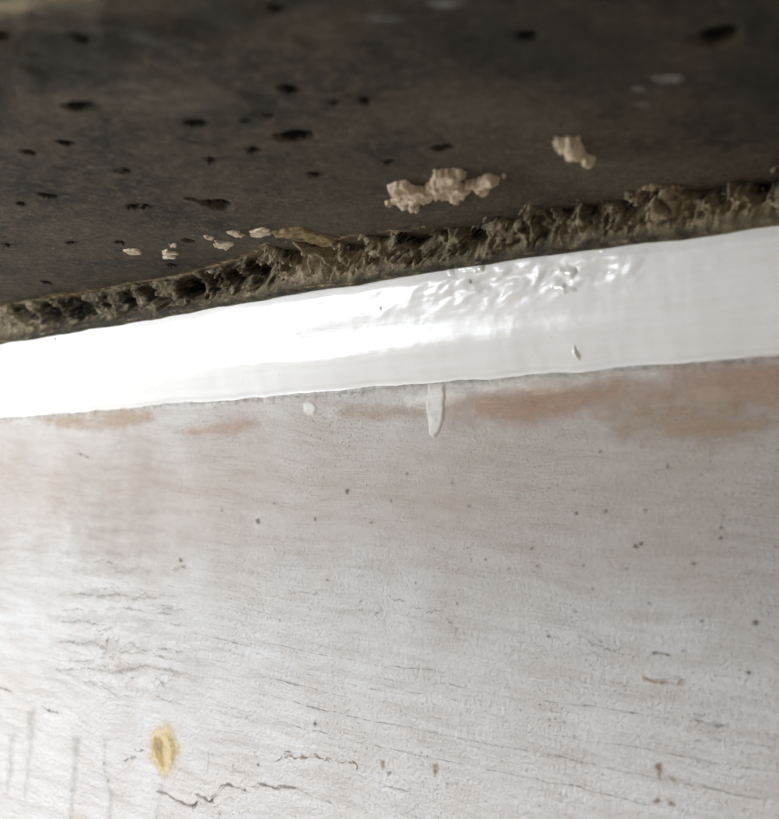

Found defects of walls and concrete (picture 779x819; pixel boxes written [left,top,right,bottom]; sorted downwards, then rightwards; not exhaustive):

spalling [0,165,779,345]
corrosion [151,726,178,774]